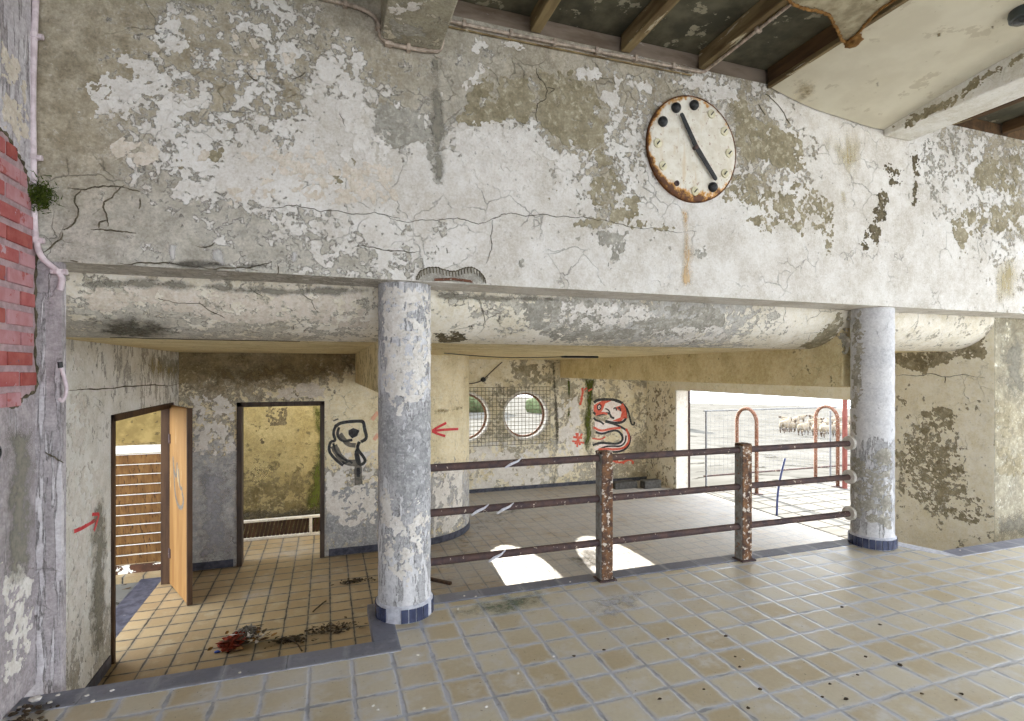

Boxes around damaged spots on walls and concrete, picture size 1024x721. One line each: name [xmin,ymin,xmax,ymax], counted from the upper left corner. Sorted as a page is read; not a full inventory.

flaking render [0,41,39,409]
crack [43,185,141,262]
crack [69,383,179,391]
damp [94,318,165,337]
peeling [78,12,210,167]
crack [120,242,279,296]
peeling [82,266,583,587]
damp [430,89,445,177]
crack [267,205,693,258]
peeling [454,37,675,269]
flaking render [668,73,835,265]
flaking render [859,133,964,254]